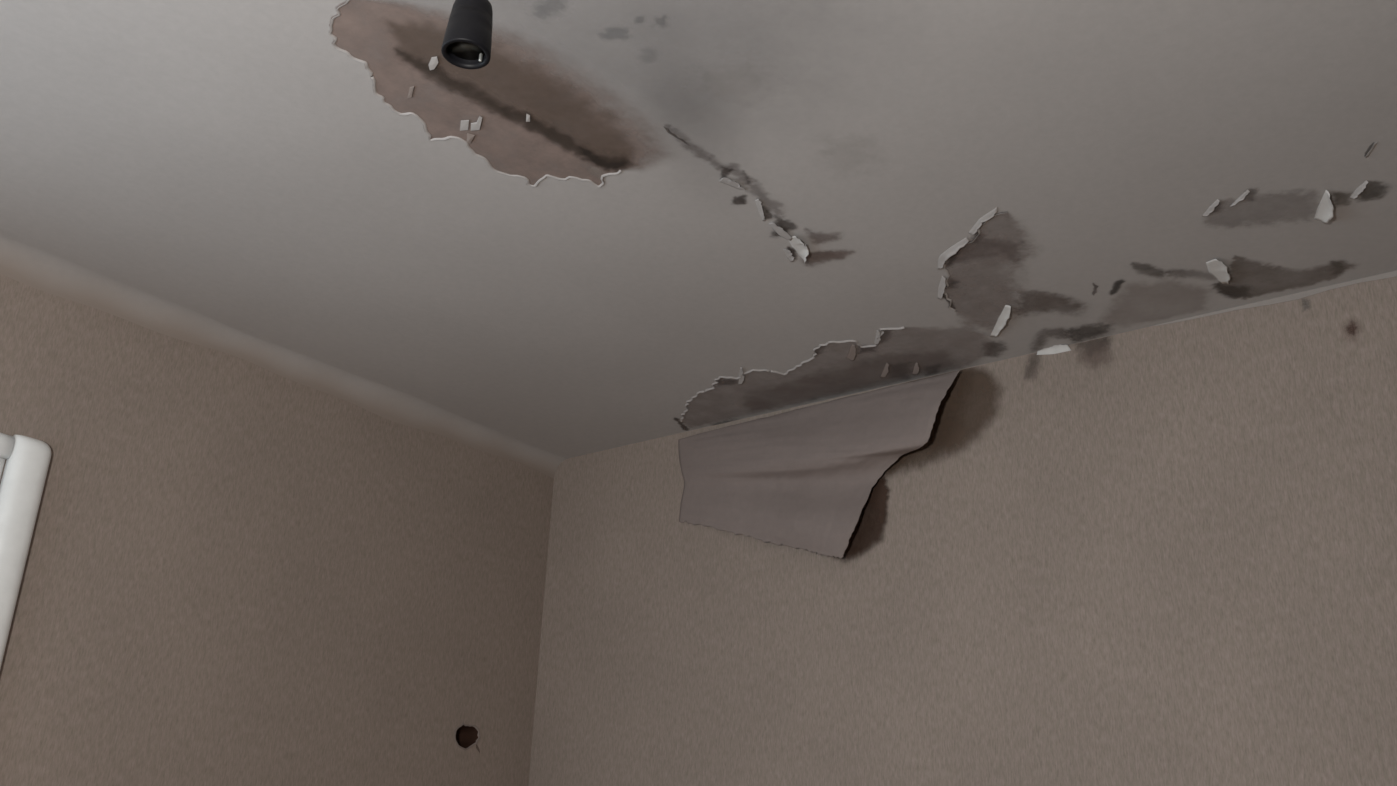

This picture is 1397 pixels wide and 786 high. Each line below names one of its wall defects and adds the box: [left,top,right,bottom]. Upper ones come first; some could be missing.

peeling [329,0,657,188]
peeling [719,168,844,263]
peeling [1202,189,1250,217]
peeling [1314,180,1384,223]
peeling [938,207,1019,351]
peeling [1092,280,1124,295]
peeling [1206,257,1348,297]
peeling [674,326,904,431]